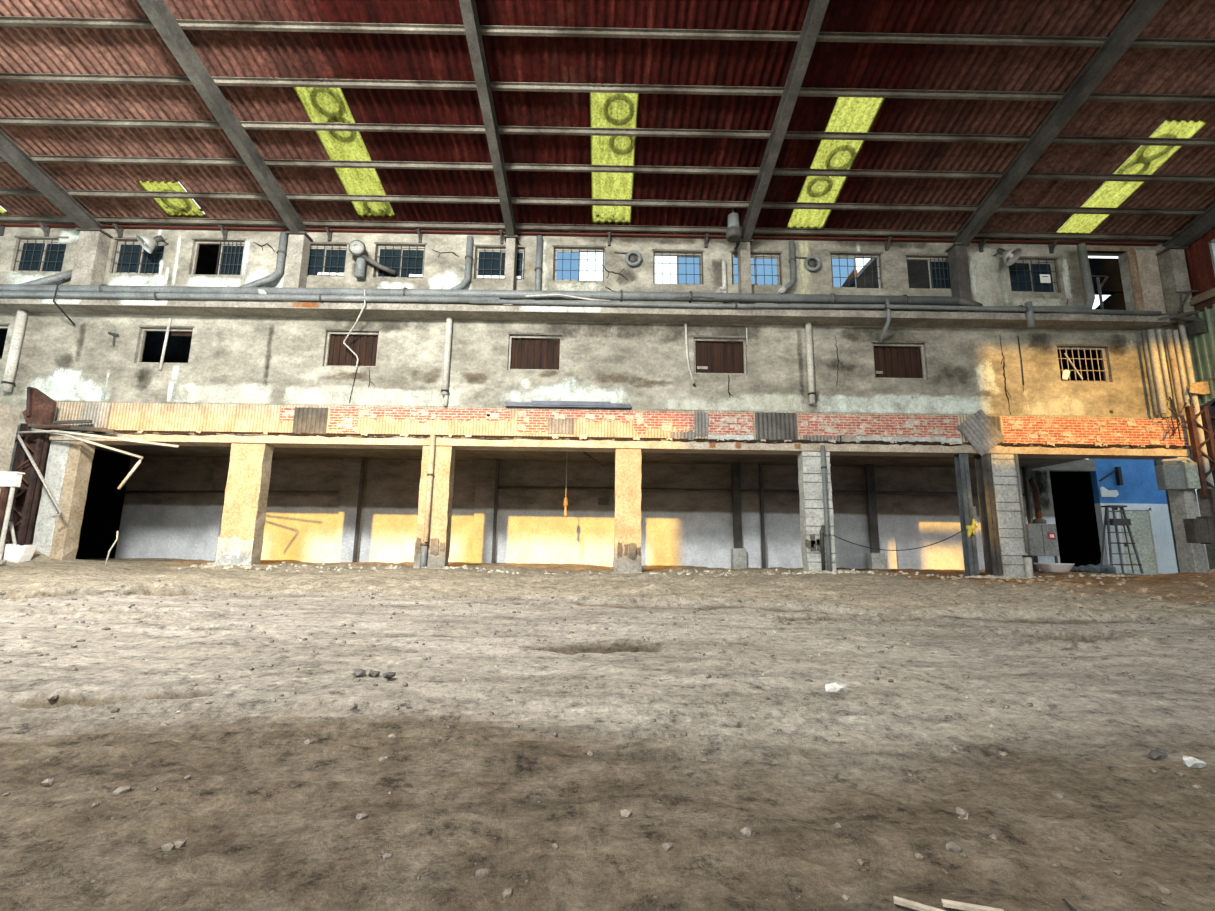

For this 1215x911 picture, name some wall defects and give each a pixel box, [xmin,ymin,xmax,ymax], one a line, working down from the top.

flaking render [81,407,960,446]